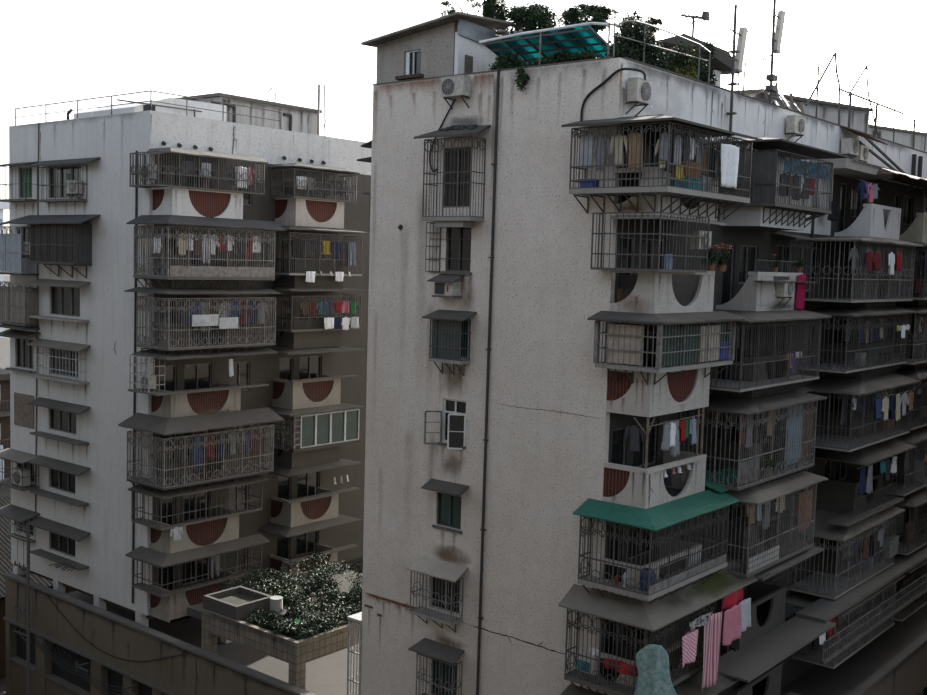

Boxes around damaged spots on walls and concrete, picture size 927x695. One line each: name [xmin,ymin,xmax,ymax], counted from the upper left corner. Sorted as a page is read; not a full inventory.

rust [369,593,416,609]
crack [462,622,576,657]